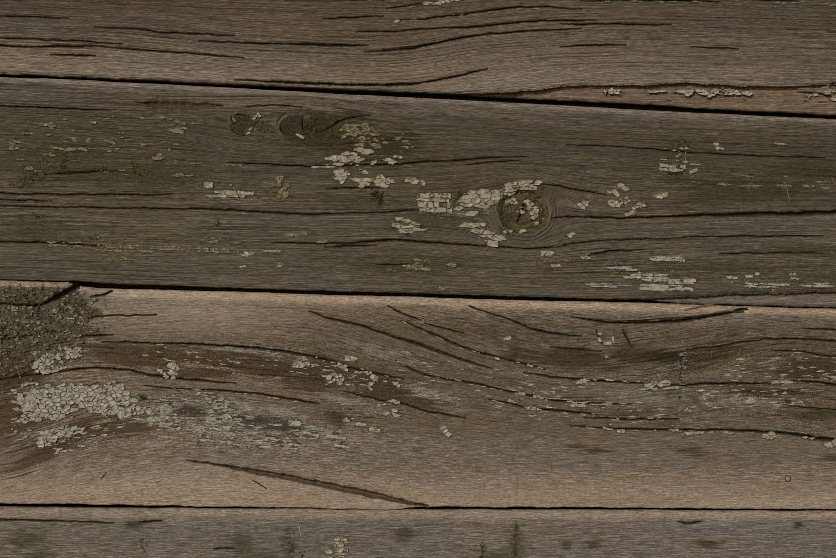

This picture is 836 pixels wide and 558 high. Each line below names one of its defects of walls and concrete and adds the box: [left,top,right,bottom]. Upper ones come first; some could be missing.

spalling [460,80,836,116]
peeling [311,121,544,249]
peeling [605,183,646,217]
peeling [658,141,701,174]
spalling [585,253,836,308]
crack [0,281,836,442]
peeling [5,323,466,456]
peeling [471,340,836,440]
crack [186,459,429,507]
peeling [325,537,353,558]